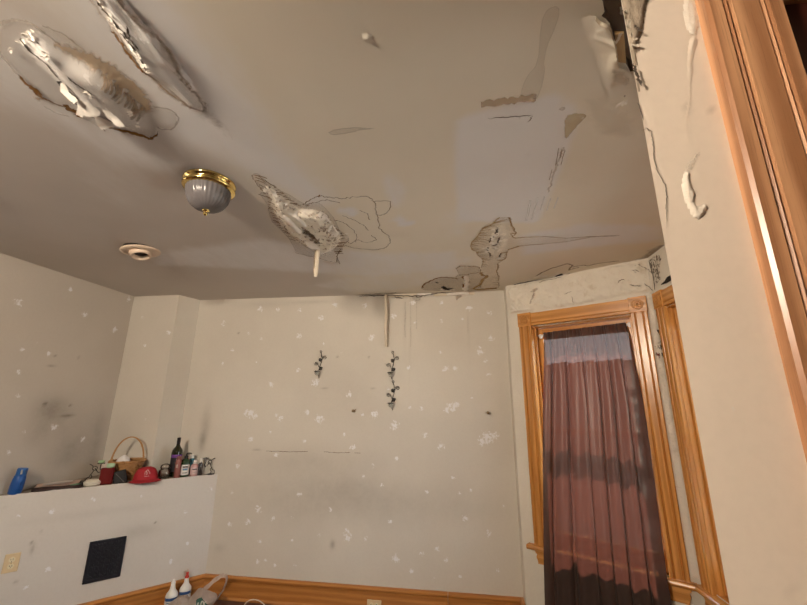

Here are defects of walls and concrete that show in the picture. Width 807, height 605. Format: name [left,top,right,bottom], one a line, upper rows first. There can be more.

flaking render [619,0,649,92]
peeling [263,186,298,224]
crack [639,105,668,223]